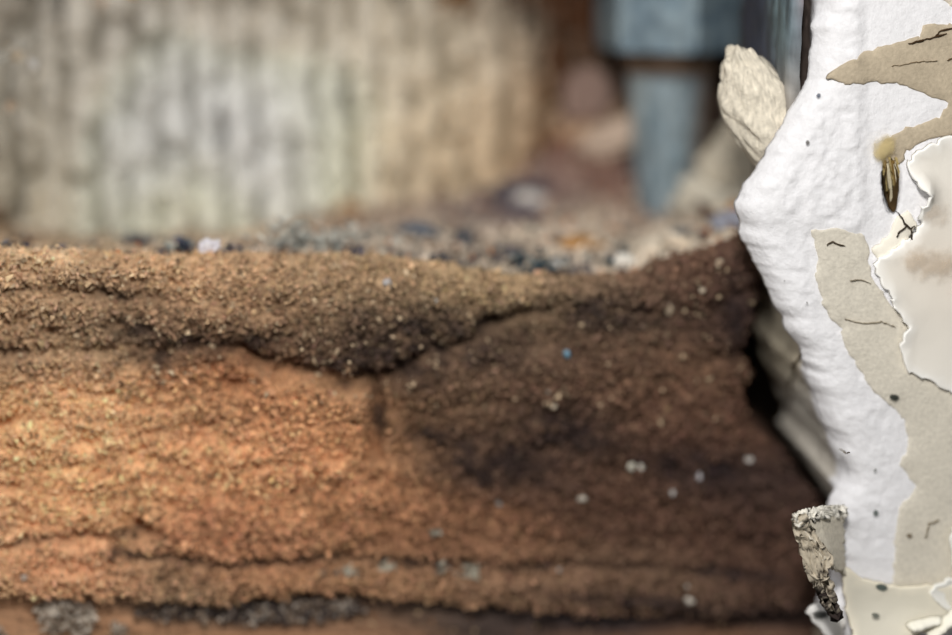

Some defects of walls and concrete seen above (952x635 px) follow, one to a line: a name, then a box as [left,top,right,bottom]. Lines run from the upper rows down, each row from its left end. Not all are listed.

flaking render [791,23,952,635]